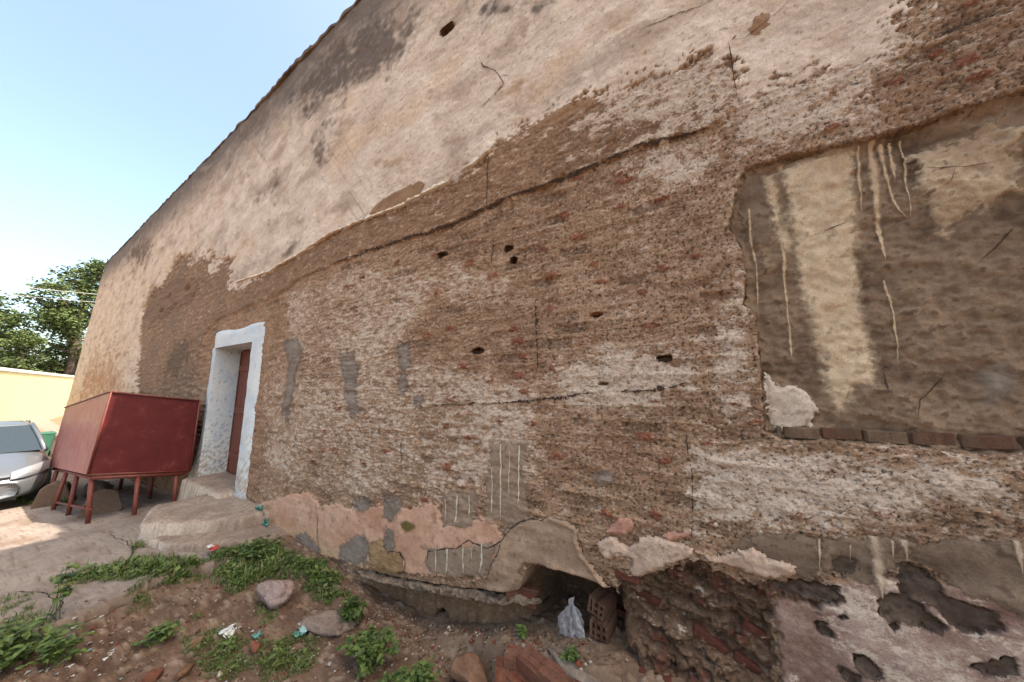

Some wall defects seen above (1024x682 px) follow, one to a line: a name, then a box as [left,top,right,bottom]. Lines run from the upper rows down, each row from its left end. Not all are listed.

crack [479,59,511,107]
peeling [235,147,493,283]
crack [336,128,705,262]
leakage [877,140,912,217]
leakage [748,209,759,308]
leakage [780,242,792,356]
crack [434,392,588,406]
crack [621,383,684,393]
leakage [868,535,909,598]
spalling [879,561,1006,639]
spalling [836,656,885,682]
spalling [971,656,1020,680]